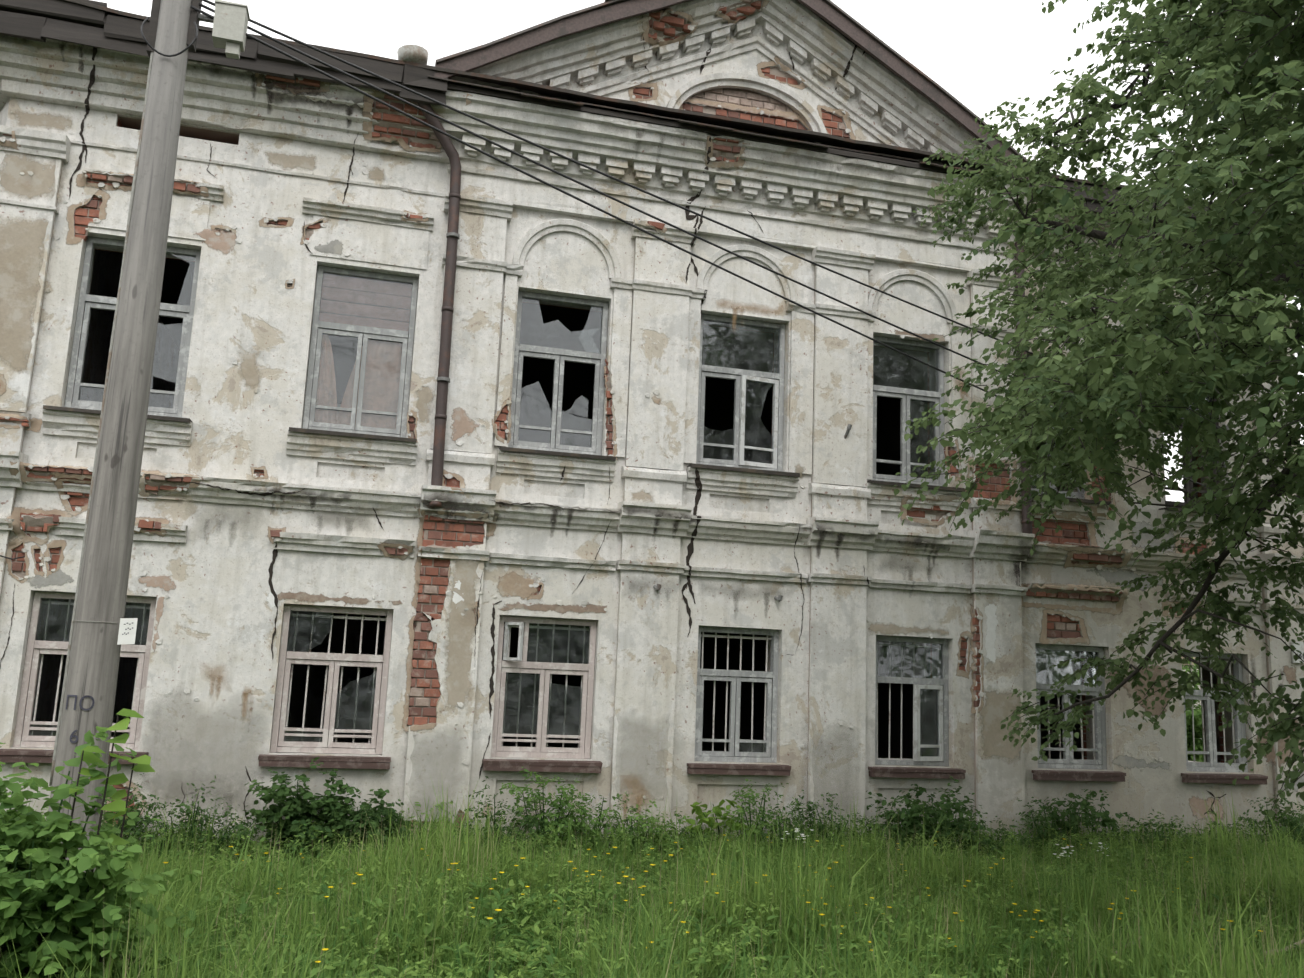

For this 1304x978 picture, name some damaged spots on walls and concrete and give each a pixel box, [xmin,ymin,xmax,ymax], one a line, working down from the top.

crack [69,47,97,198]
crack [700,47,711,73]
flaking render [679,57,856,169]
flaking render [0,111,134,395]
crack [685,137,711,319]
flaking render [5,462,93,590]
crack [268,541,278,660]
flaking render [266,508,607,735]
crack [474,569,502,779]
crack [682,468,702,635]
flaking render [866,604,1026,759]
flaking render [1020,448,1215,645]